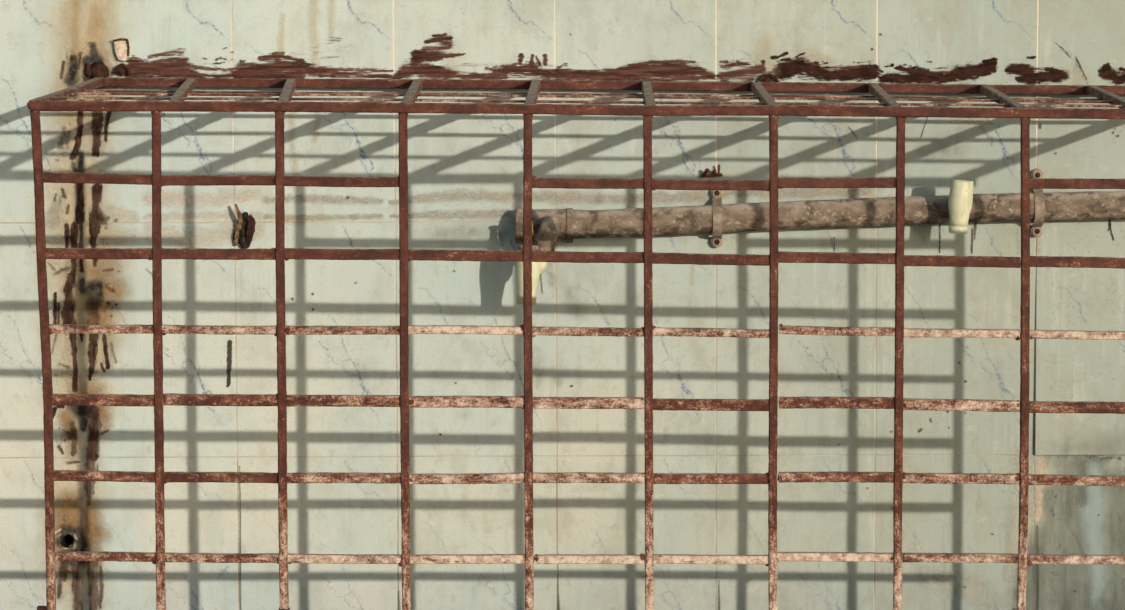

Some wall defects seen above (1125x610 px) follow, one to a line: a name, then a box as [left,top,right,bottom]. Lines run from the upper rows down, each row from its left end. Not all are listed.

corrosion [60,0,130,97]
corrosion [53,259,123,334]
spalling [60,533,75,548]
corrosion [53,391,109,610]
leakage [1083,456,1121,610]